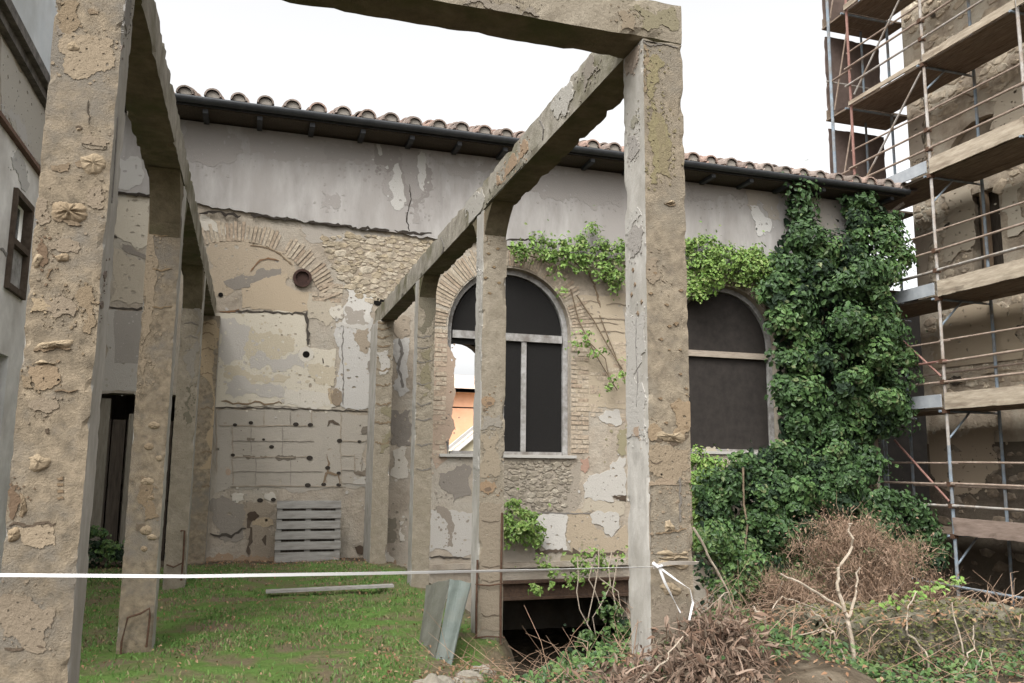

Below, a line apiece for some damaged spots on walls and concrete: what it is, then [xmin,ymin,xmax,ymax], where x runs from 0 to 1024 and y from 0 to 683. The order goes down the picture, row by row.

peeling [417,151,432,191]
crack [199,184,444,254]
peeling [746,189,783,237]
spalling [200,214,434,561]
flaking render [429,333,629,646]